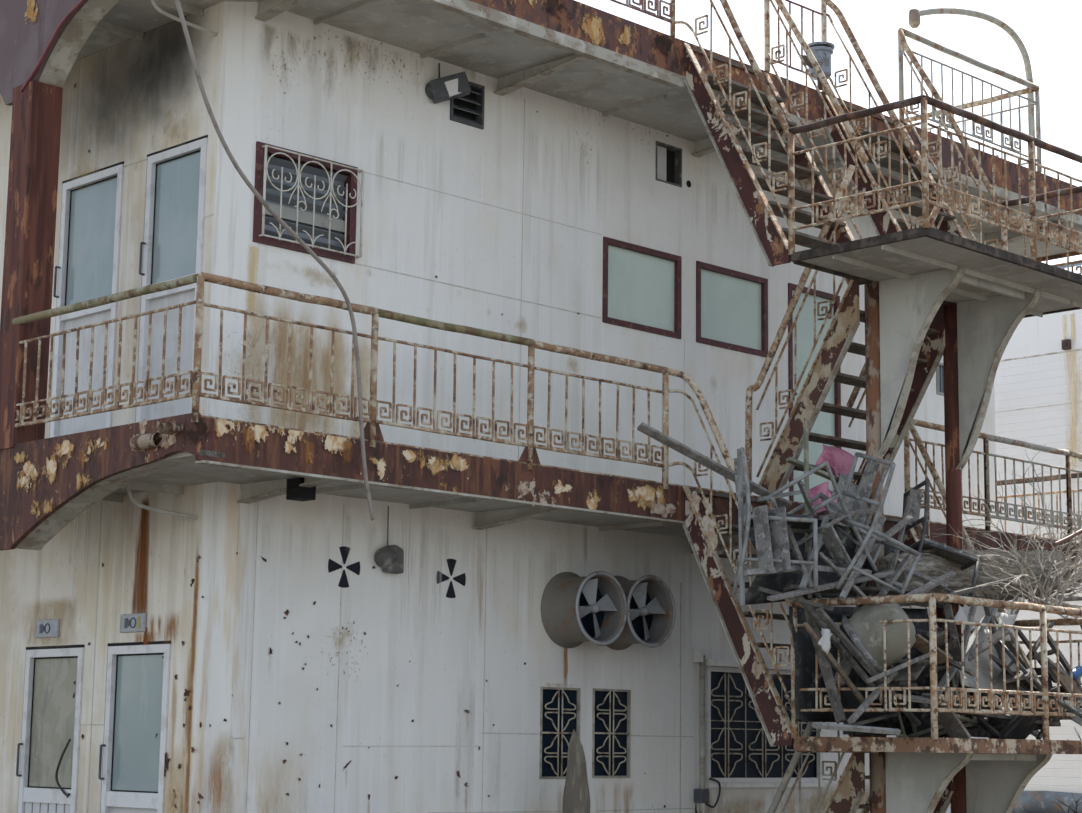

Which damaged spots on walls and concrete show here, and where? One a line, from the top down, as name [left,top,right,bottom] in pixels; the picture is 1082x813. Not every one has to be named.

peeling [24,0,38,23]
peeling [510,0,605,46]
peeling [618,25,633,57]
peeling [652,35,674,57]
peeling [130,417,354,462]
peeling [14,437,109,516]
peeling [370,458,386,481]
peeling [400,450,469,492]
corrosion [133,501,175,645]
corrosion [185,563,198,813]
corrosion [209,743,231,813]